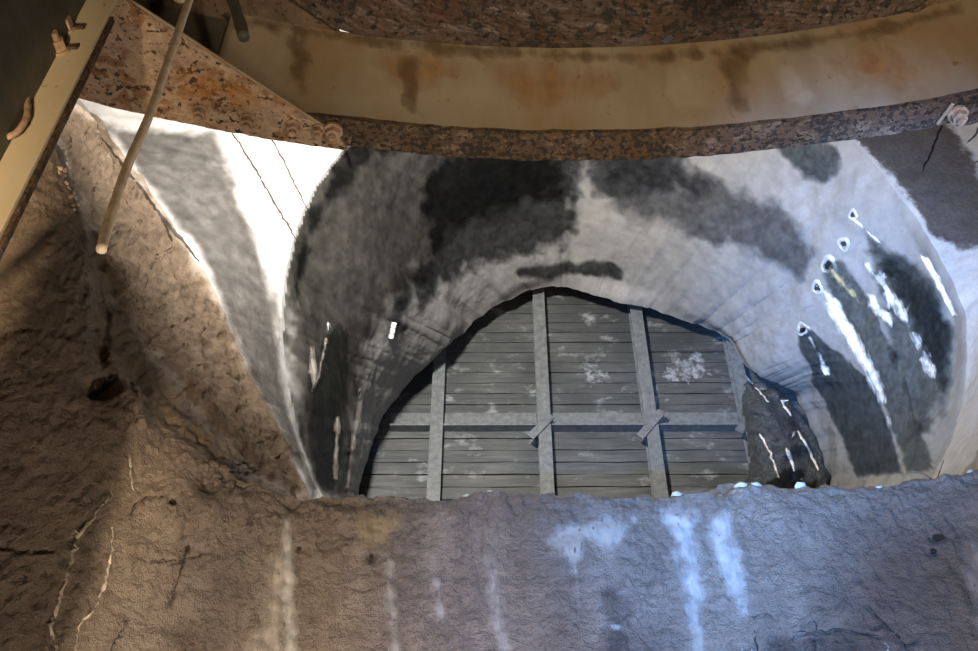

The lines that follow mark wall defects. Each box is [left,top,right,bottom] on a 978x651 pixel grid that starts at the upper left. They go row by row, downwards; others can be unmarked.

leakage [781,143,838,181]
leakage [857,125,978,249]
leakage [119,132,803,494]
leakage [799,218,955,475]
crack [0,546,51,554]
leakage [554,518,624,563]
leakage [666,514,691,552]
leakage [714,515,739,588]
leakage [253,523,295,651]
leakage [686,574,700,597]
crack [792,604,912,651]